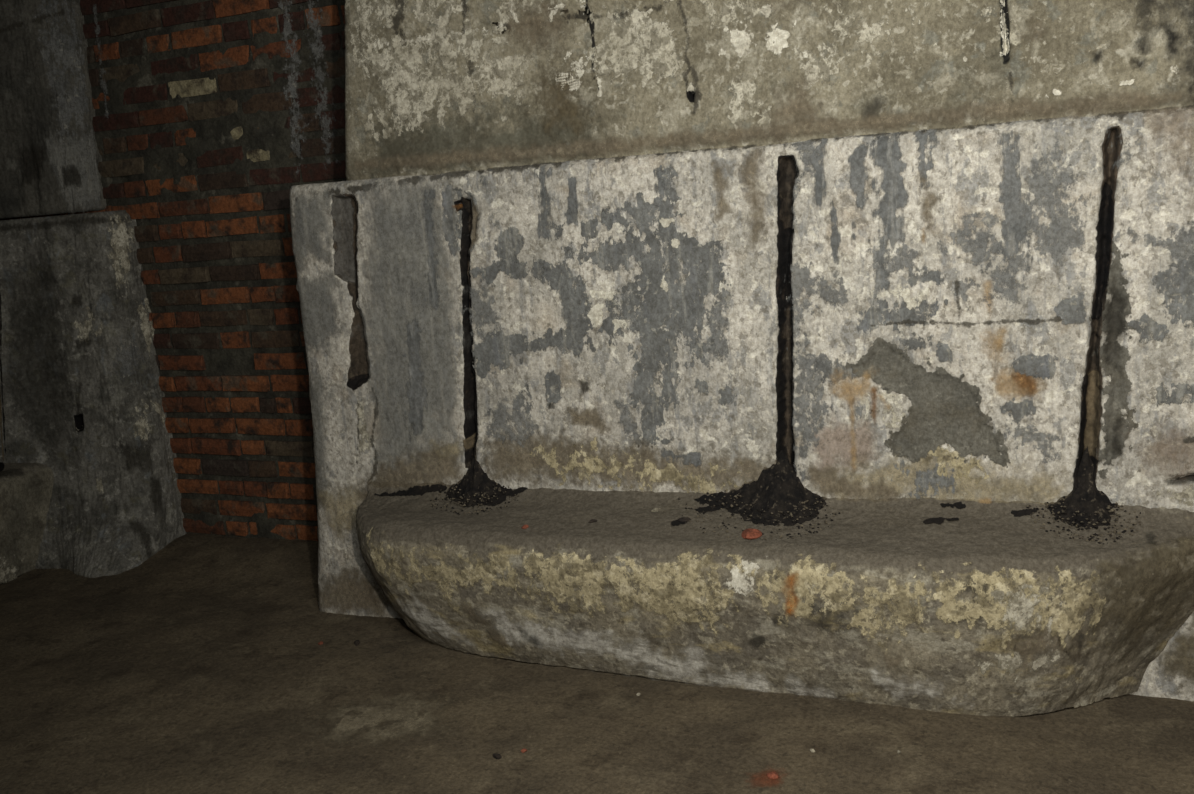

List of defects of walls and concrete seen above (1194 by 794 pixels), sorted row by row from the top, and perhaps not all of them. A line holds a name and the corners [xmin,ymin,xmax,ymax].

damp [278,0,338,174]
crack [562,0,701,114]
crack [785,0,1049,143]
damp [1166,29,1190,74]
damp [293,192,337,350]
damp [311,0,1177,535]
rust [996,372,1038,395]
damp [319,527,1194,695]
damp [791,683,834,698]